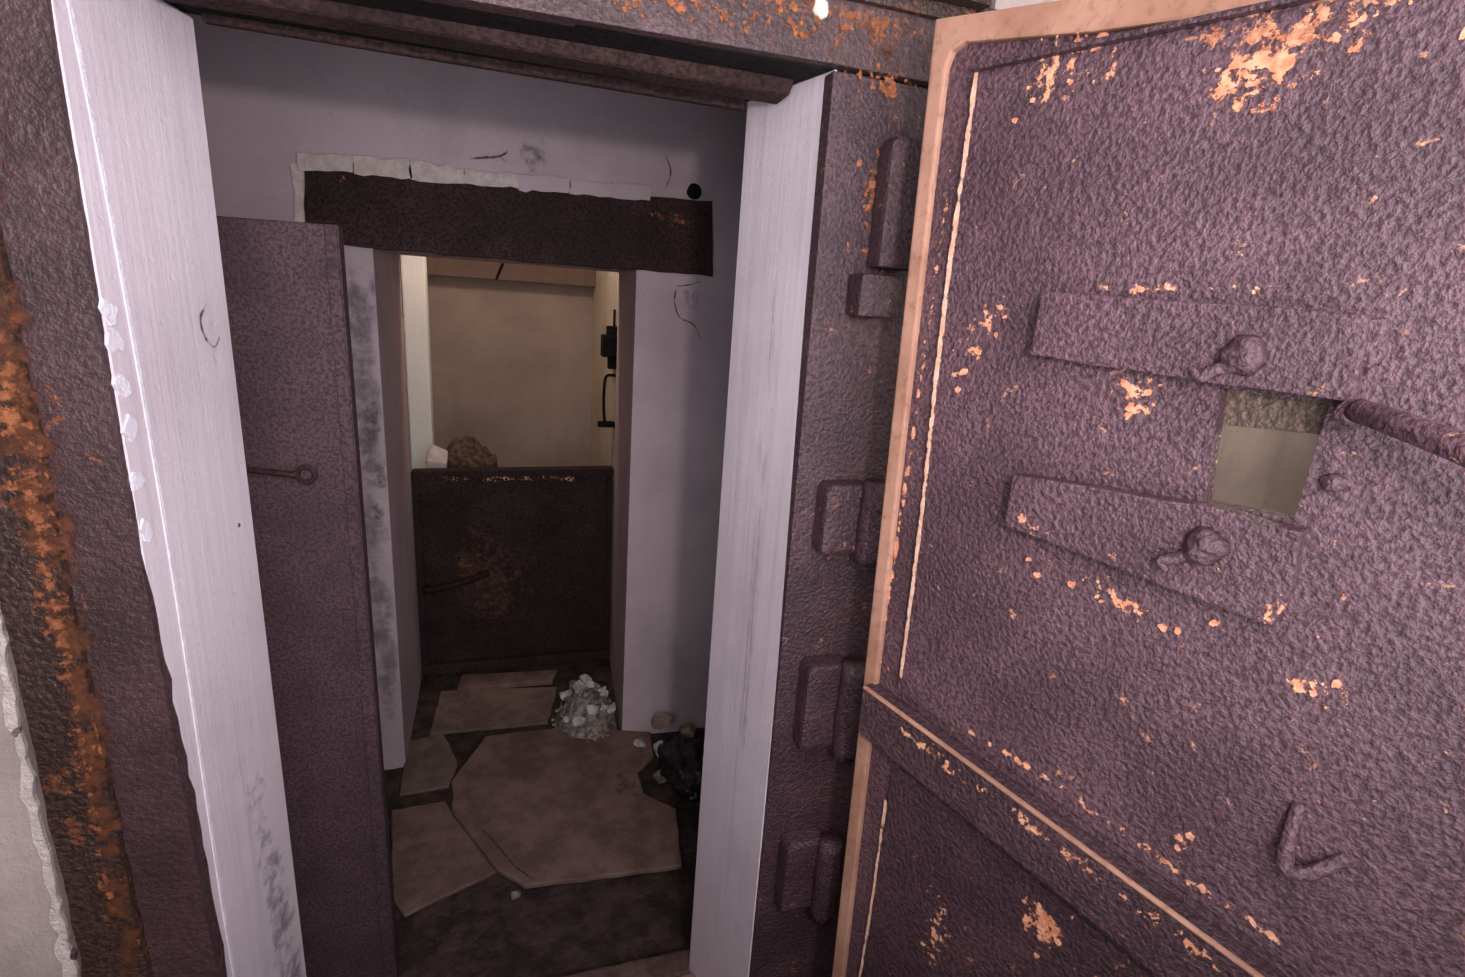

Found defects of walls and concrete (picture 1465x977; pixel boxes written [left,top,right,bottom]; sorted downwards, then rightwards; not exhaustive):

rust [0,264,140,977]
rust [613,0,923,120]
rust [854,150,879,273]
rust [880,199,948,664]